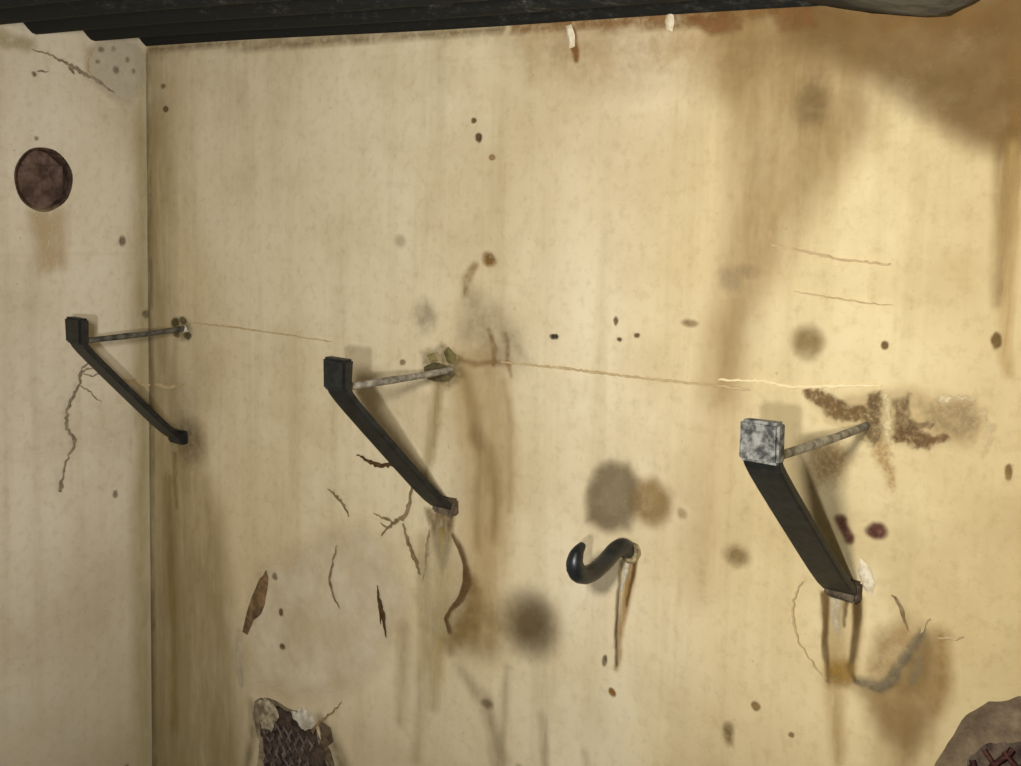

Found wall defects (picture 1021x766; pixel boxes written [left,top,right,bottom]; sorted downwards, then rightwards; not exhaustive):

damp [784,0,1021,205]
crack [58,363,102,492]
crack [356,454,393,468]
crack [373,487,430,581]
corrosion [836,516,853,543]
corrosion [867,524,886,538]
peeling [236,530,401,690]
crack [377,585,387,638]
corrosion [615,562,636,650]
corrosion [821,592,862,682]
spalling [253,697,343,766]
spalling [935,696,1021,766]